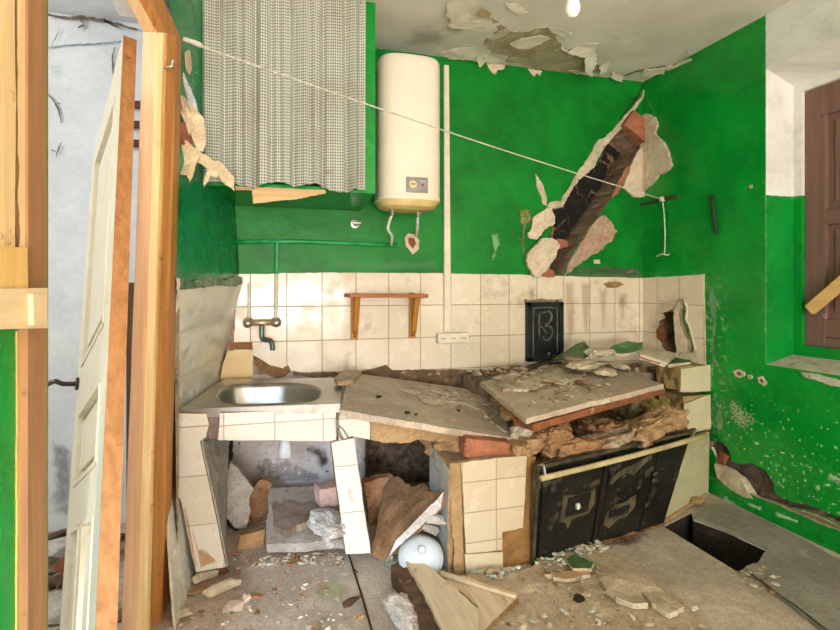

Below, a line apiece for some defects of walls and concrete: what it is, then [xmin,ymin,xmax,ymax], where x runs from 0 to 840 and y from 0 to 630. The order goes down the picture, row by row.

crack [48,13,138,74]
peeling [440,0,692,82]
crack [48,94,62,123]
peeling [179,50,235,191]
spalling [525,89,673,278]
spalling [404,233,419,254]
spalling [656,298,697,353]
spalling [733,369,767,386]
leakage [308,447,328,467]
spalling [709,400,840,529]